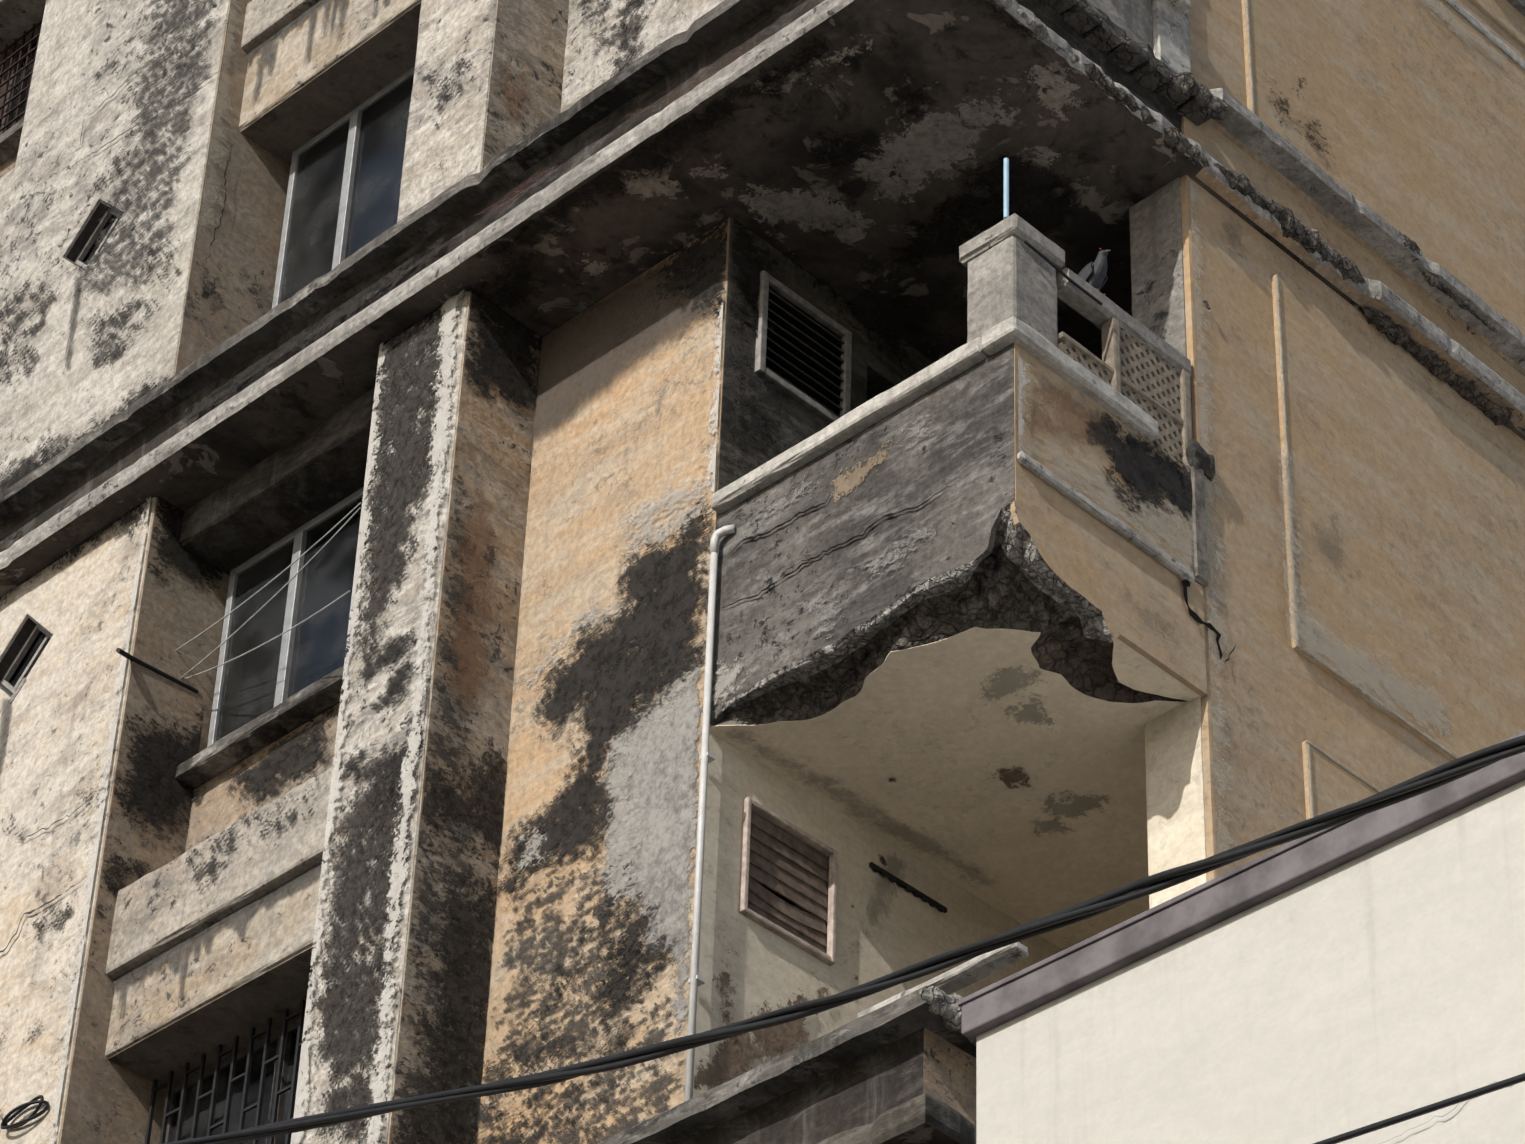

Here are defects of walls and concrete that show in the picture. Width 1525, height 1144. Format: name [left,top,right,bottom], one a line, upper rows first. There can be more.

leakage [427,19,477,128]
leakage [0,0,226,392]
peeling [619,0,1365,284]
spalling [1398,231,1498,333]
spalling [1363,307,1516,430]
mould [1086,411,1193,523]
leakage [80,38,832,1144]
crack [1182,579,1236,663]
spalling [596,500,1186,908]
leakage [1027,790,1109,837]
leakage [27,895,76,947]